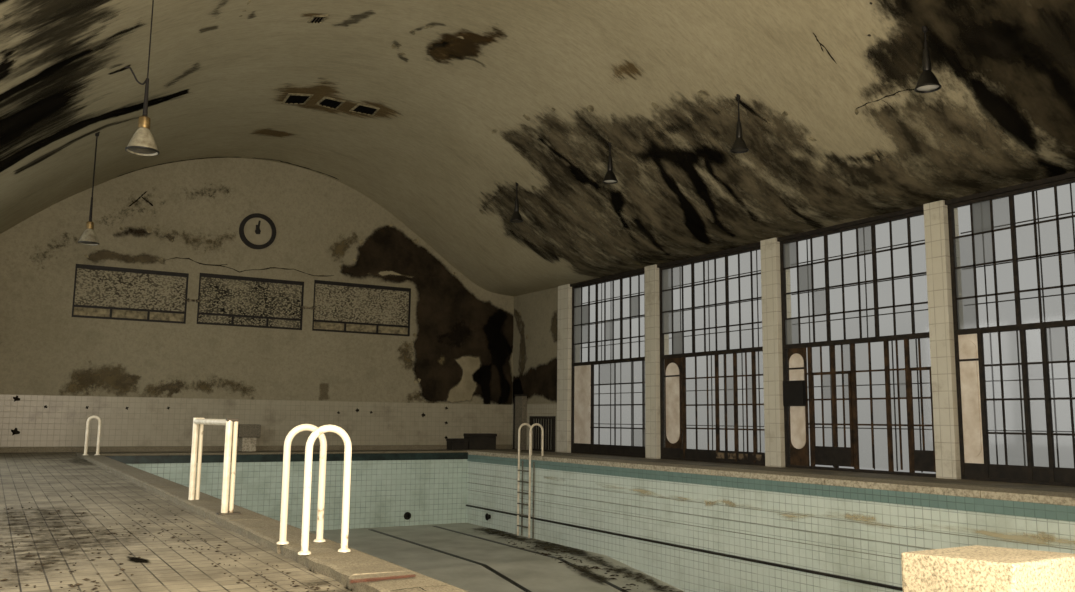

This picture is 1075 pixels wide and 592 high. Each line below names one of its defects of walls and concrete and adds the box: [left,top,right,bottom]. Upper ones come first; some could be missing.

damp [0,0,198,174]
damp [864,0,1075,177]
damp [60,361,253,399]
flaking render [339,224,557,405]